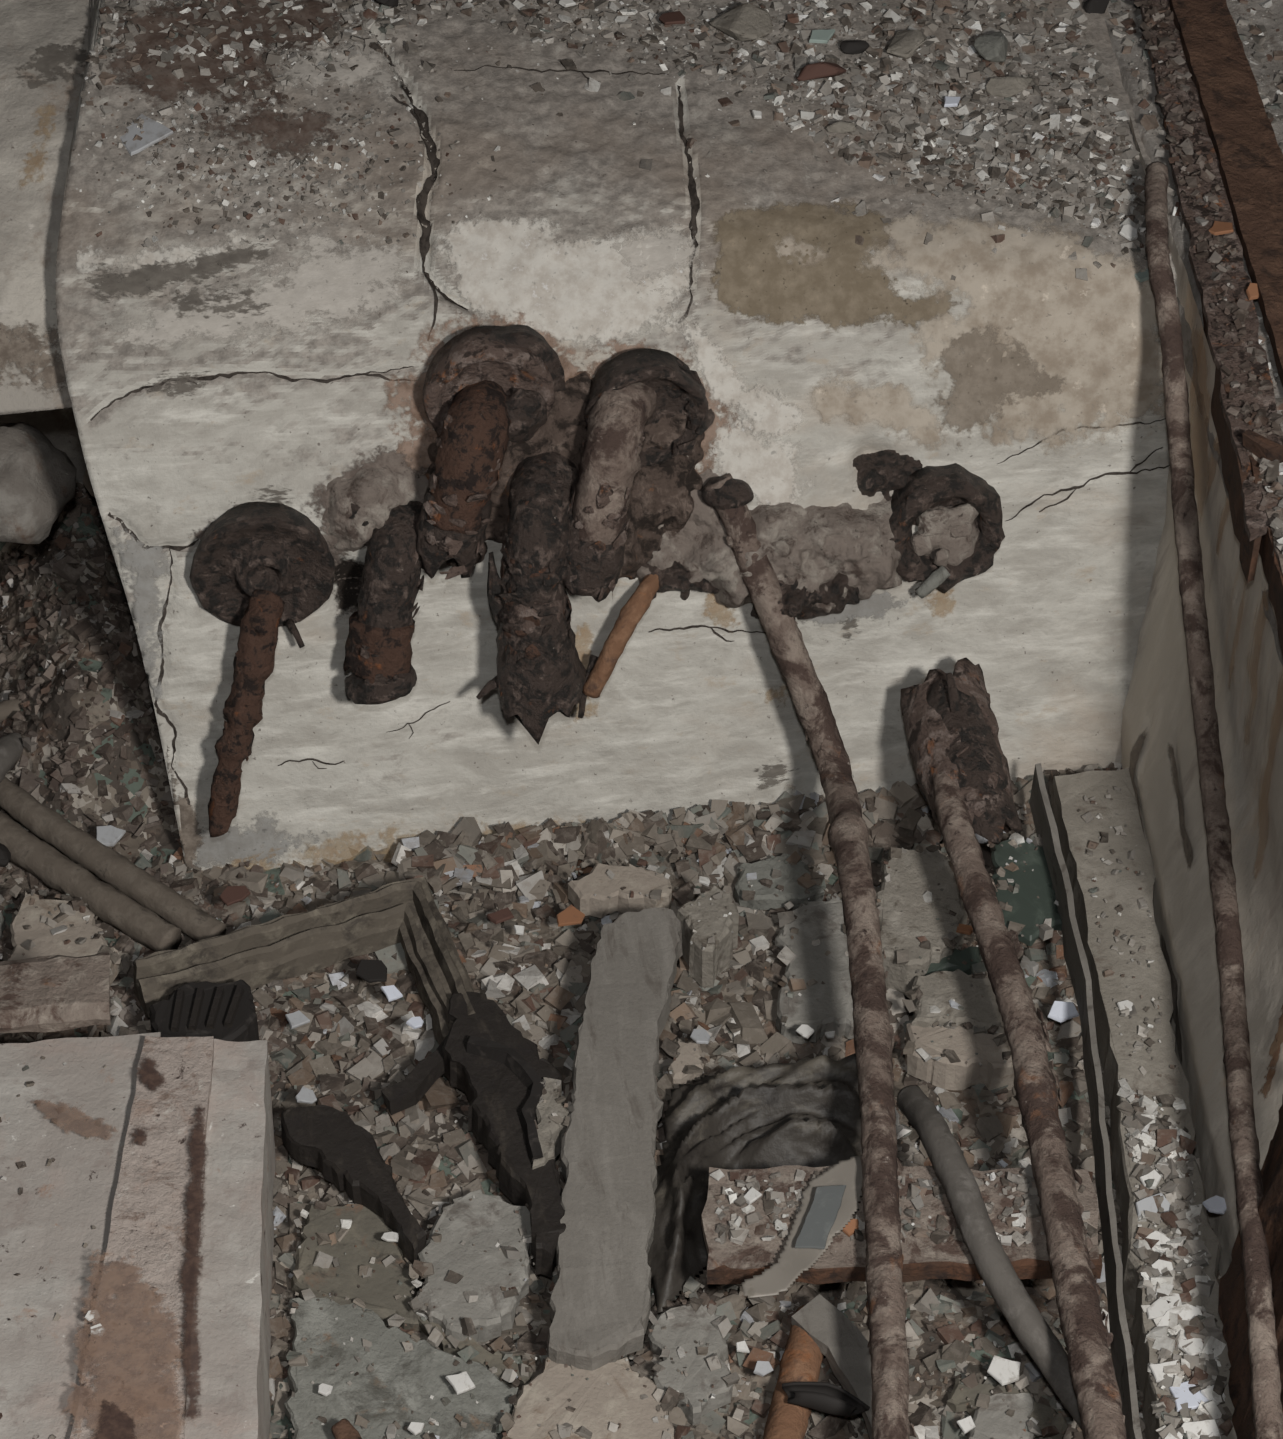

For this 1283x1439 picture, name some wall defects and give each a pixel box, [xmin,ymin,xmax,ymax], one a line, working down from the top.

crack [91,35,468,421]
crack [454,65,700,324]
corrosion [385,312,650,475]
corrosion [696,378,736,474]
leakage [812,326,1064,448]
crack [998,418,1170,521]
corrosion [1258,1005,1283,1098]